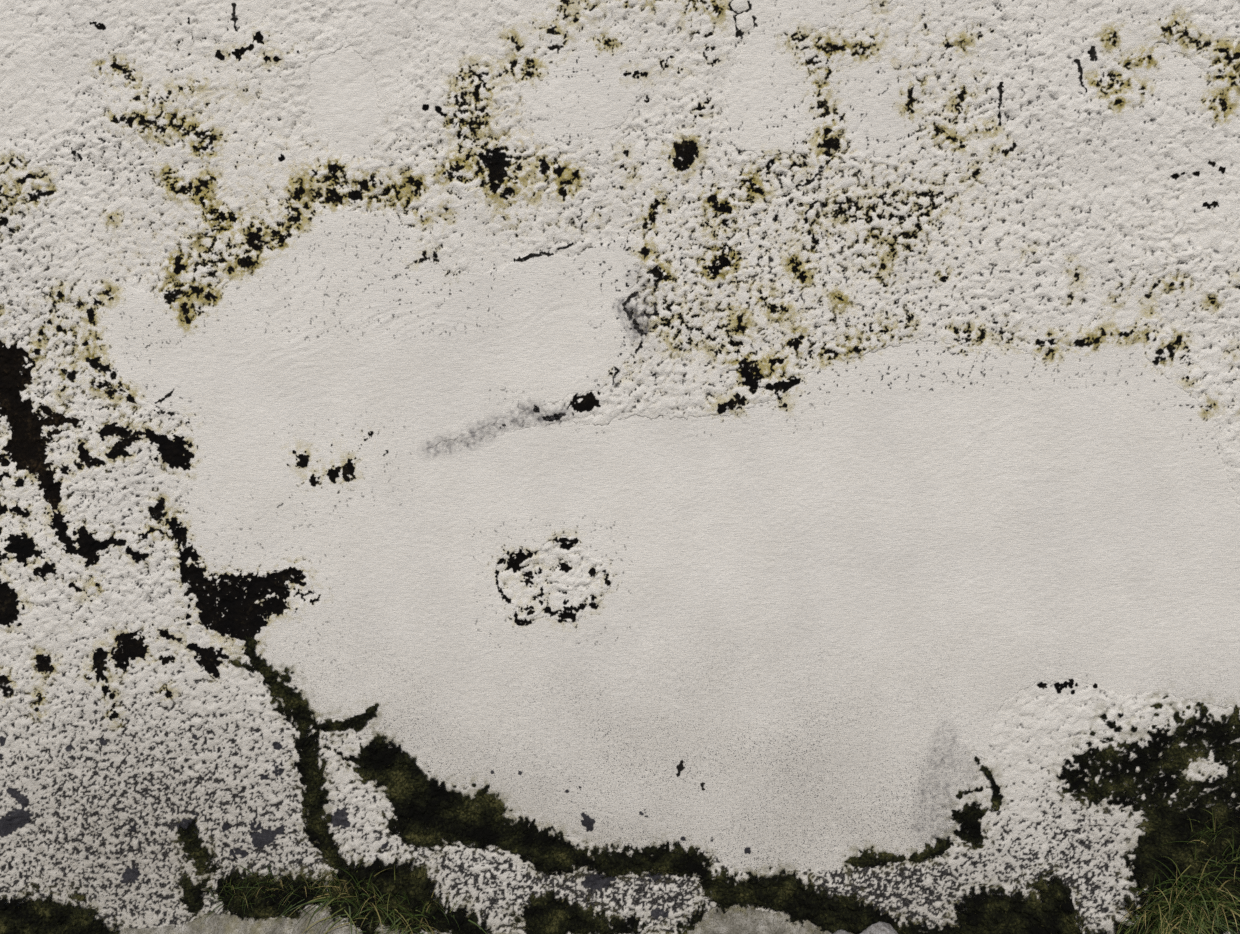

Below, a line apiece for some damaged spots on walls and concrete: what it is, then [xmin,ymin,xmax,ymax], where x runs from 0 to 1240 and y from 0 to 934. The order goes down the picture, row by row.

damp [675,0,730,66]
damp [900,7,1025,150]
damp [1088,49,1156,145]
damp [1159,14,1240,121]
damp [0,153,56,244]
damp [96,0,597,330]
damp [613,27,1019,421]
damp [1171,161,1226,179]
damp [945,267,1240,386]
damp [500,391,601,428]
damp [0,281,321,721]
spalling [510,552,613,624]